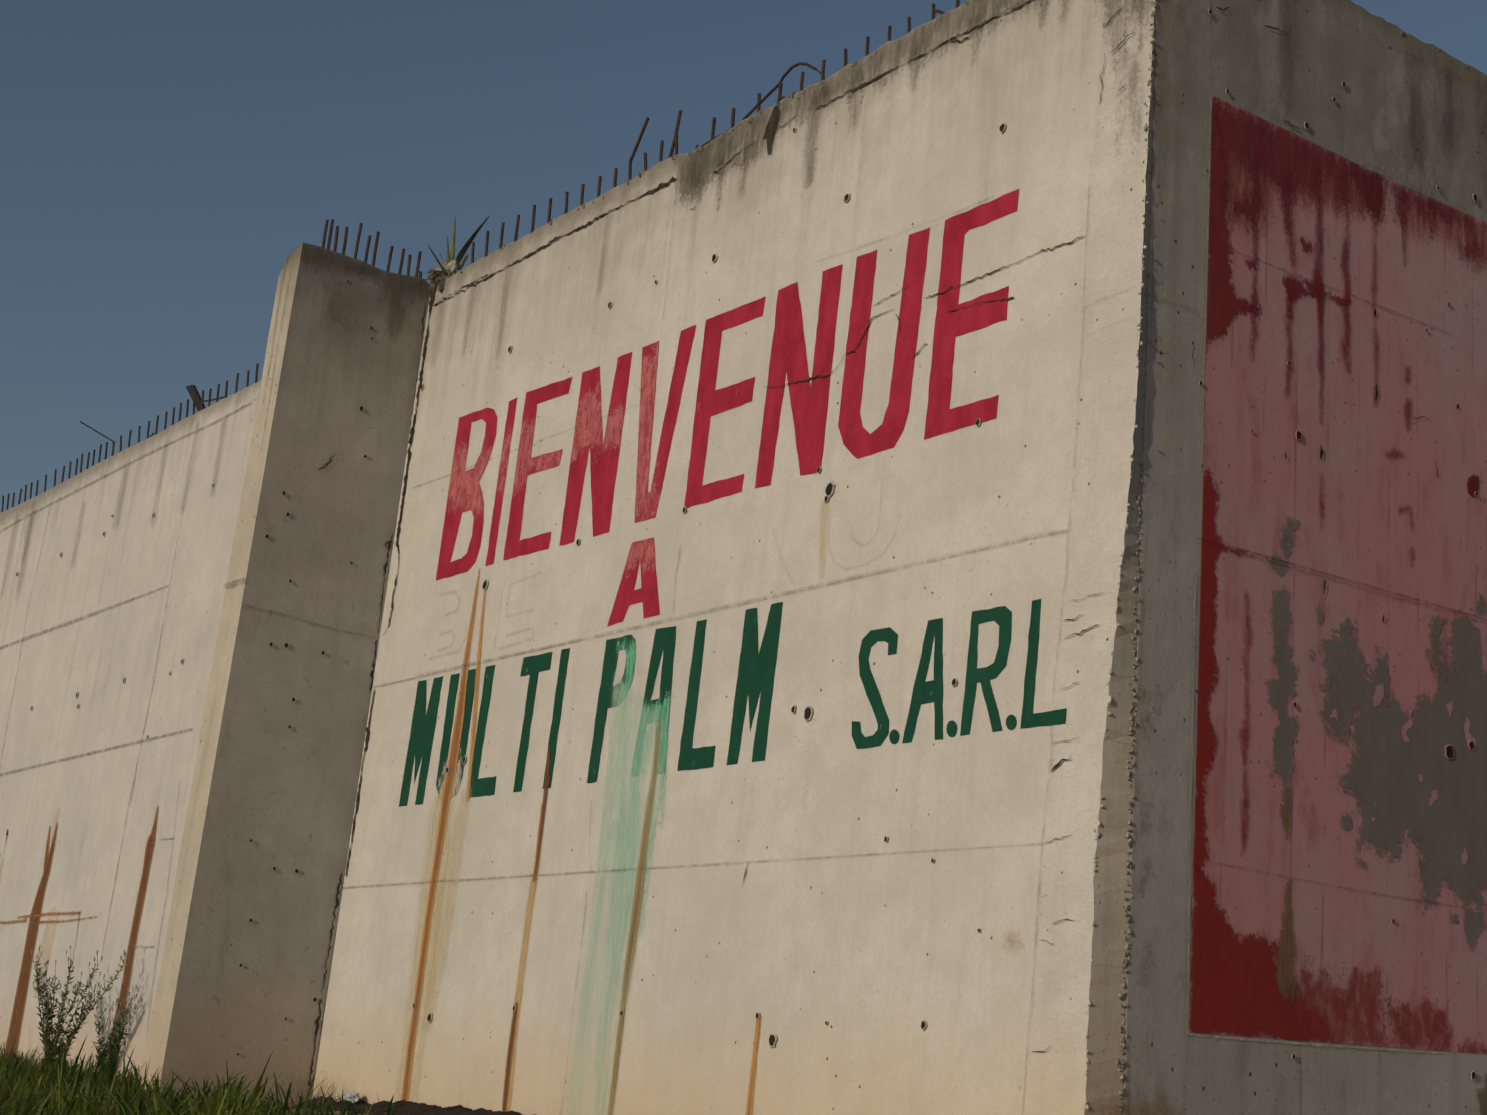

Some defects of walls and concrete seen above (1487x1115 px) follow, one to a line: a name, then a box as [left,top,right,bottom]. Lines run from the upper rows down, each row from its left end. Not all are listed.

leakage [679,0,1029,192]
crack [713,0,1031,174]
crack [764,236,1084,388]
leakage [1286,275,1294,390]
leakage [1343,306,1351,370]
crack [308,176,693,1086]
peeling [1261,516,1487,952]
rust [1,824,96,1059]
rust [111,807,158,1041]
rust [401,570,485,1101]
peeling [1388,999,1486,1054]
peeling [1476,1074,1487,1115]